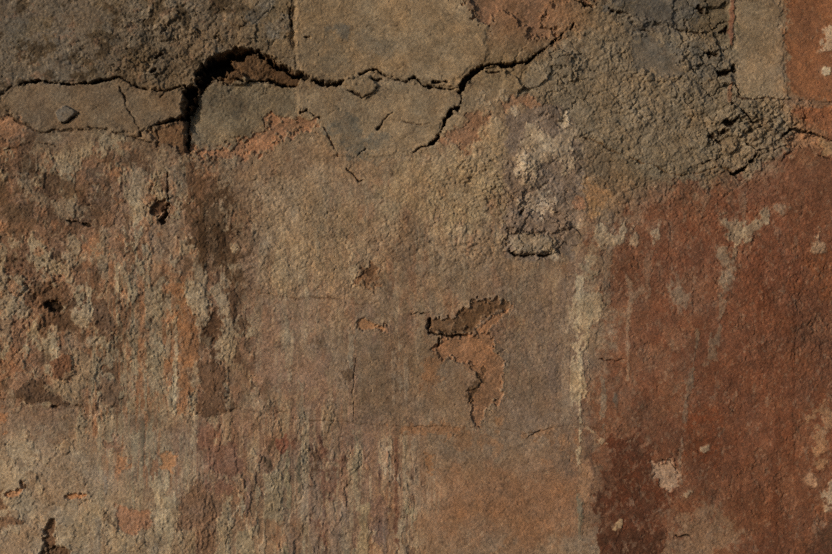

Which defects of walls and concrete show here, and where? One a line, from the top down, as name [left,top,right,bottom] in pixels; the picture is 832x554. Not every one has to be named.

crack [0,0,629,156]
crack [299,109,366,183]
crack [640,20,705,35]
crack [582,83,832,177]
spalling [414,296,515,426]
damp [533,246,684,554]
damp [665,271,693,316]
damp [680,243,738,424]